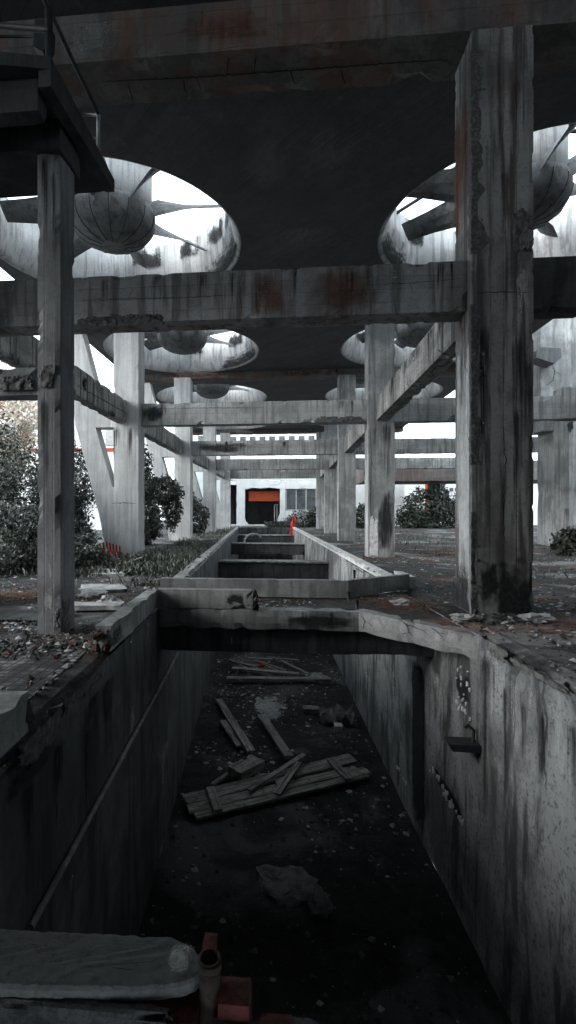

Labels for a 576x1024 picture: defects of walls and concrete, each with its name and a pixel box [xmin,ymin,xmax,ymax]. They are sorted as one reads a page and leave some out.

spalling [467,49,490,255]
spalling [77,313,165,327]
spalling [0,364,56,390]
damp [379,493,392,547]
damp [453,330,531,613]
damp [482,658,506,762]
spalling [137,651,512,1024]